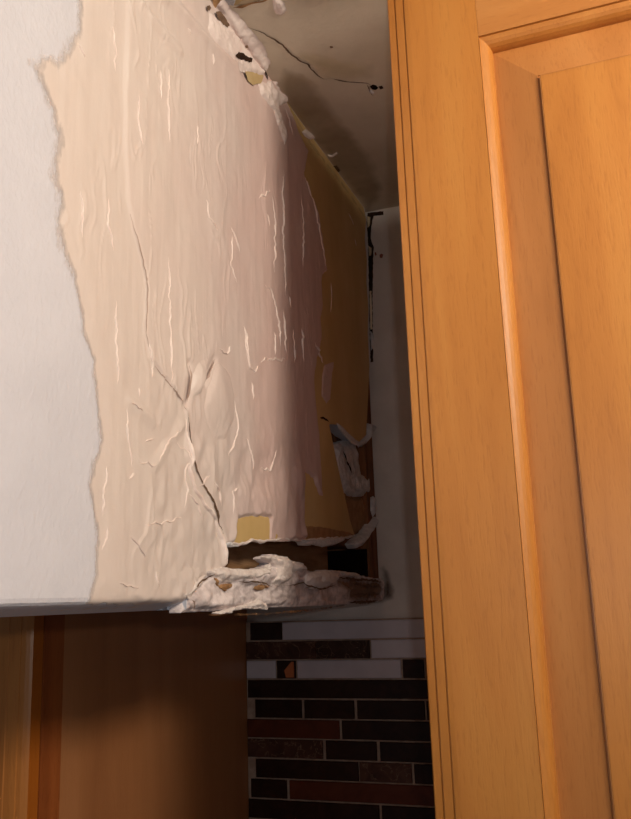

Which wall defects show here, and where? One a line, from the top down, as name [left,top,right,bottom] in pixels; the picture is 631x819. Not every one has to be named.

spalling [207,0,236,11]
crack [234,0,267,8]
crack [248,27,372,95]
crack [130,214,149,347]
crack [155,366,229,567]
spalling [232,534,355,546]
spalling [169,549,385,614]